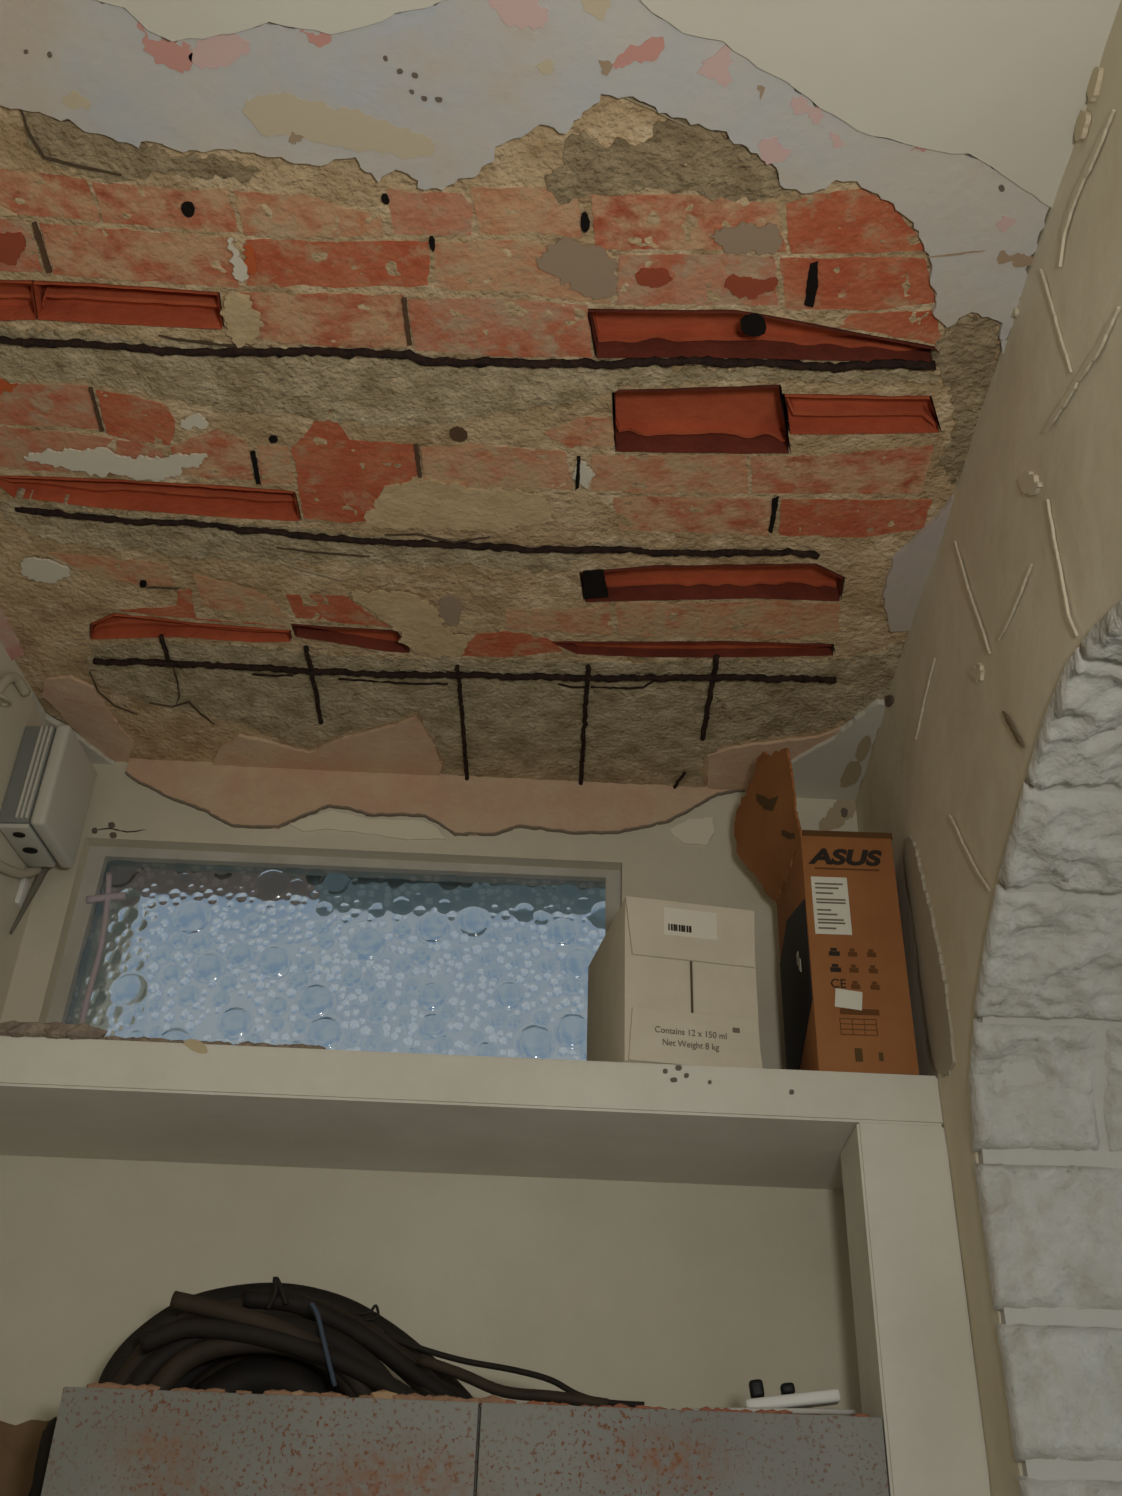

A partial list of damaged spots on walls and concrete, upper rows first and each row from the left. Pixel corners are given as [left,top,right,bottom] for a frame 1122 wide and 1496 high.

peeling [0,0,1050,773]
peeling [290,810,445,841]
peeling [669,817,714,846]
peeling [0,1420,50,1496]